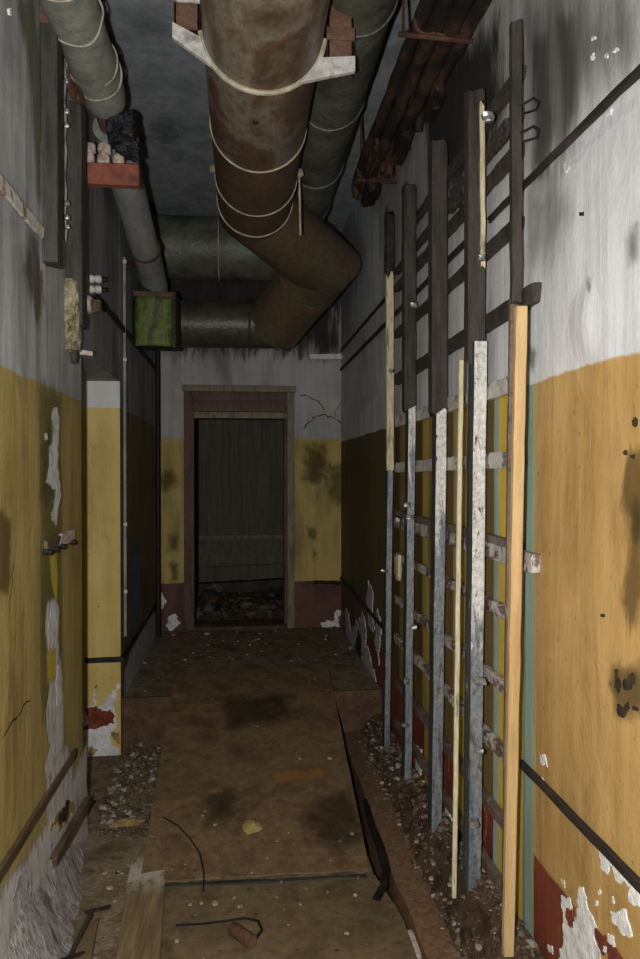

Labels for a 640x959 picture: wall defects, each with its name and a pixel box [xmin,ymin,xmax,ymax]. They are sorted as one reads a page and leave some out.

crack [299,394,341,428]
peeling [44,407,61,525]
damp [623,450,640,618]
peeling [44,552,64,779]
peeling [161,593,181,631]
peeling [320,580,382,682]
peeling [82,683,121,757]
spalling [49,800,75,832]
peeling [547,851,640,959]